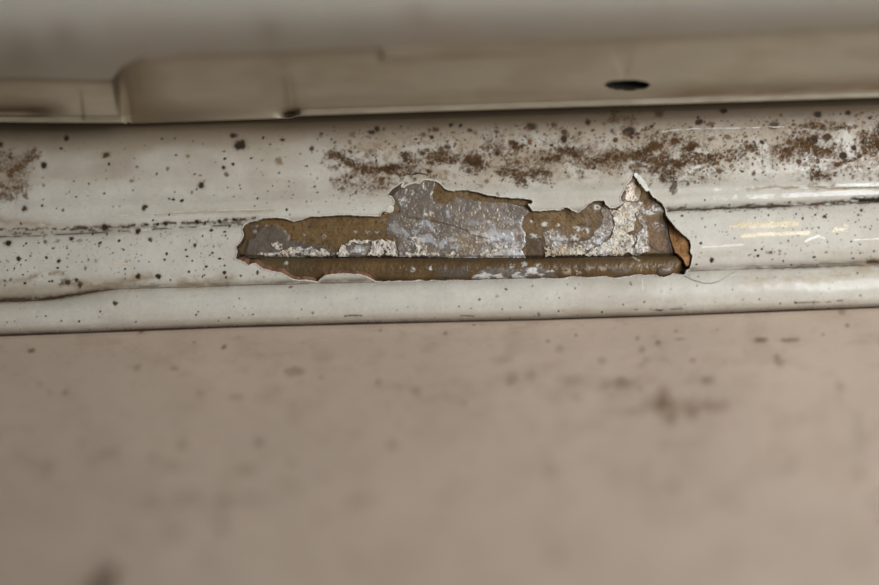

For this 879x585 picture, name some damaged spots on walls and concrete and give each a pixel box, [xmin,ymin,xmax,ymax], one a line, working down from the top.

peeling [234,173,694,283]